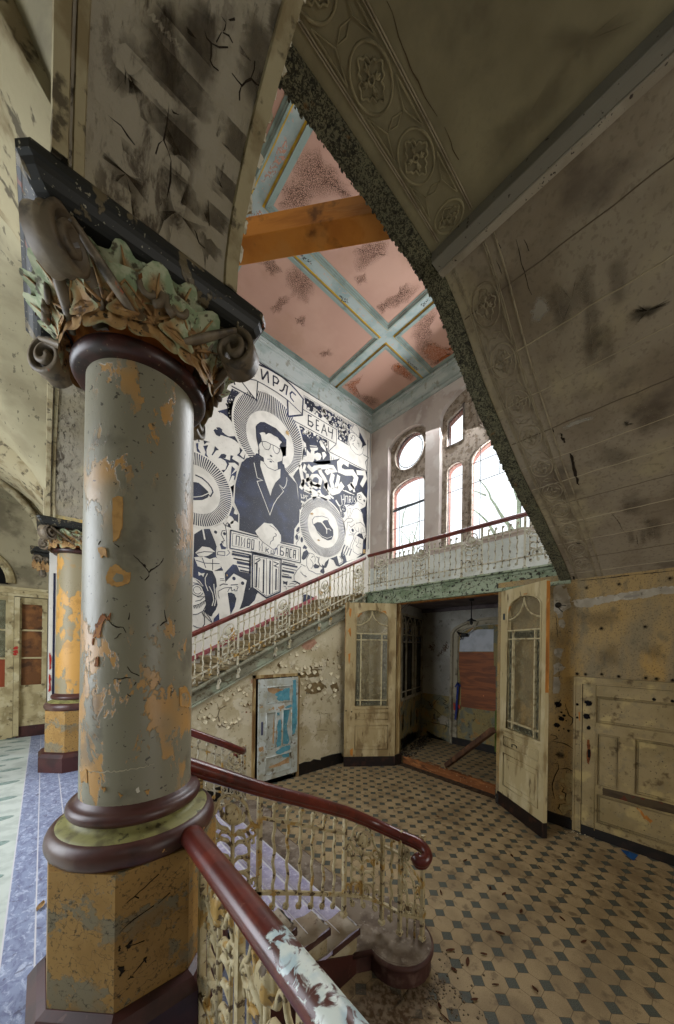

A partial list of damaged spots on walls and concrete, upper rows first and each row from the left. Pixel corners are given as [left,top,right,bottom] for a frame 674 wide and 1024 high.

crack [204,16,259,101]
crack [109,108,179,206]
leakage [636,305,660,318]
flaking render [239,65,674,694]
peeling [98,496,131,587]
crack [98,541,164,580]
peeling [92,613,111,645]
peeling [179,639,351,729]